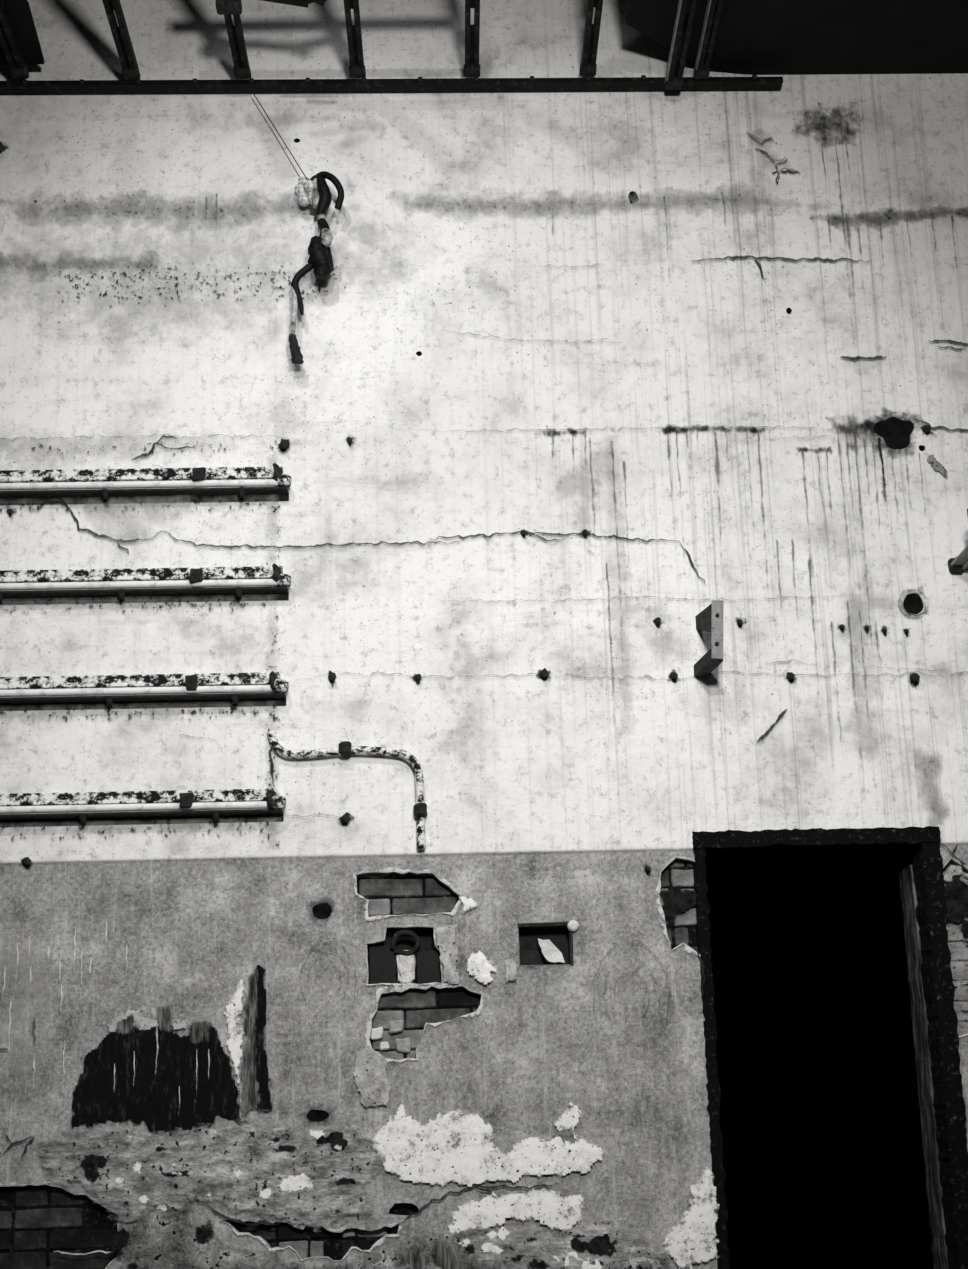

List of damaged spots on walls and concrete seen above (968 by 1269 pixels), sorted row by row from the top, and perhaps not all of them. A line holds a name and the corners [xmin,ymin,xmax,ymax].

leakage [53,193,302,221]
leakage [407,192,769,214]
leakage [810,145,968,252]
crack [692,255,867,280]
leakage [838,426,923,506]
crack [34,498,861,602]
leakage [922,758,945,820]
flaking render [353,867,478,929]
flaking render [656,856,701,957]
flaking render [942,858,968,1038]
flaking render [364,978,483,1063]
peeling [0,1101,720,1269]